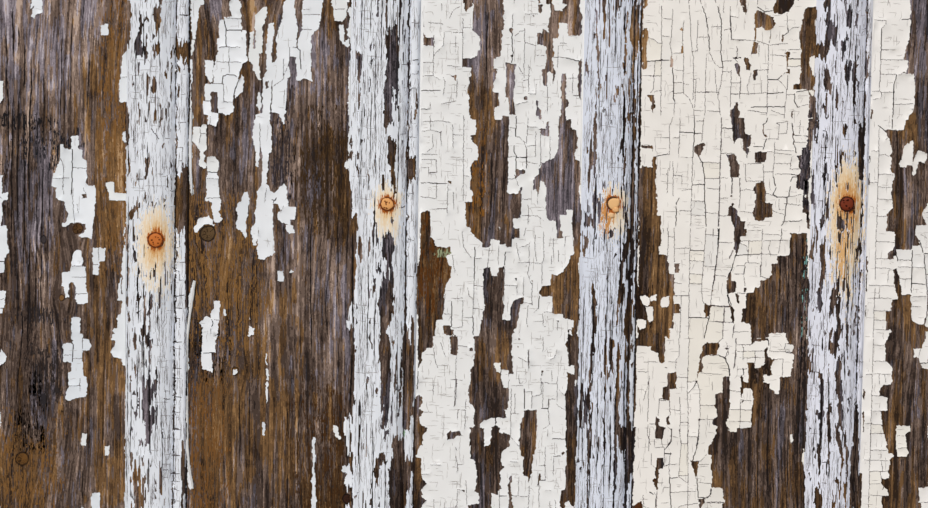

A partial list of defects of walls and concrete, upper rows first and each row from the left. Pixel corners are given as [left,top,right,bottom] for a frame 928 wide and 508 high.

rust [132,197,181,312]
peeling [0,0,458,508]
rust [368,179,406,248]
rust [592,176,630,249]
peeling [447,0,928,508]
rust [825,145,867,325]